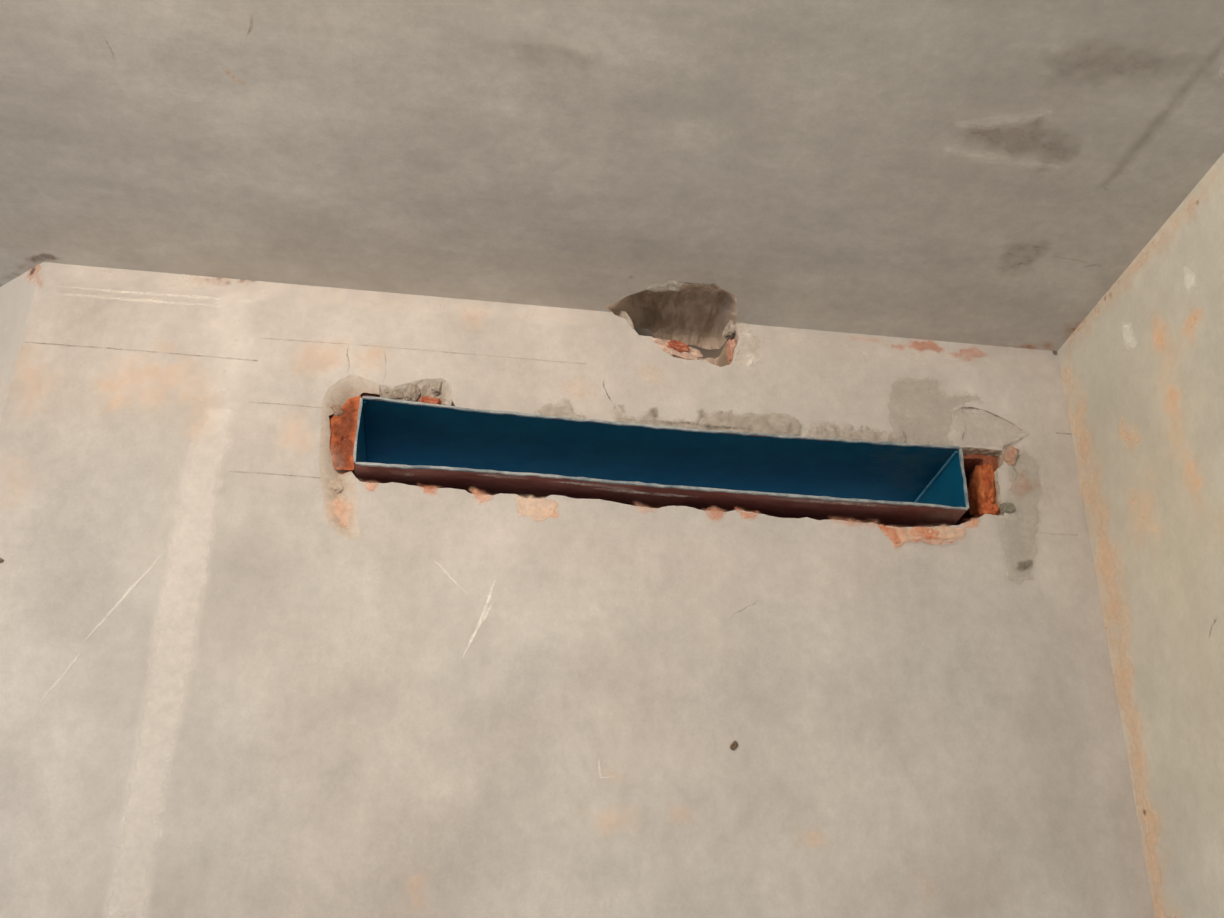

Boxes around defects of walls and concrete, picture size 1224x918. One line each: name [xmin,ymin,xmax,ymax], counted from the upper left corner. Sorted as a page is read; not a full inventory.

spalling [879,447,1004,546]